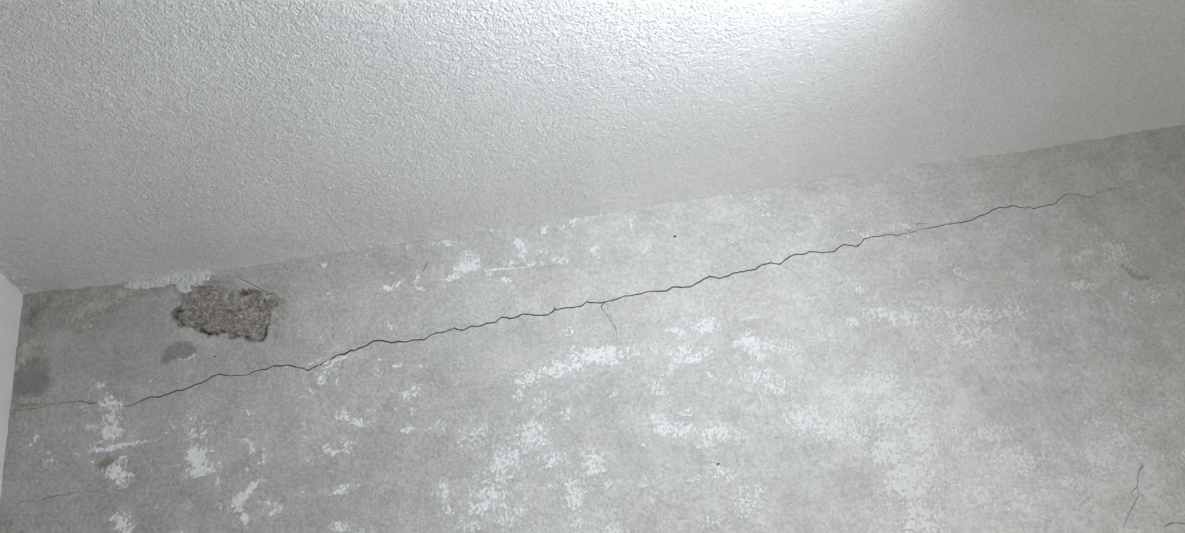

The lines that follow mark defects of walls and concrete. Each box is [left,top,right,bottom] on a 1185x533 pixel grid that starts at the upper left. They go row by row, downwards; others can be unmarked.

spalling [170,284,280,343]
crack [15,187,1121,410]